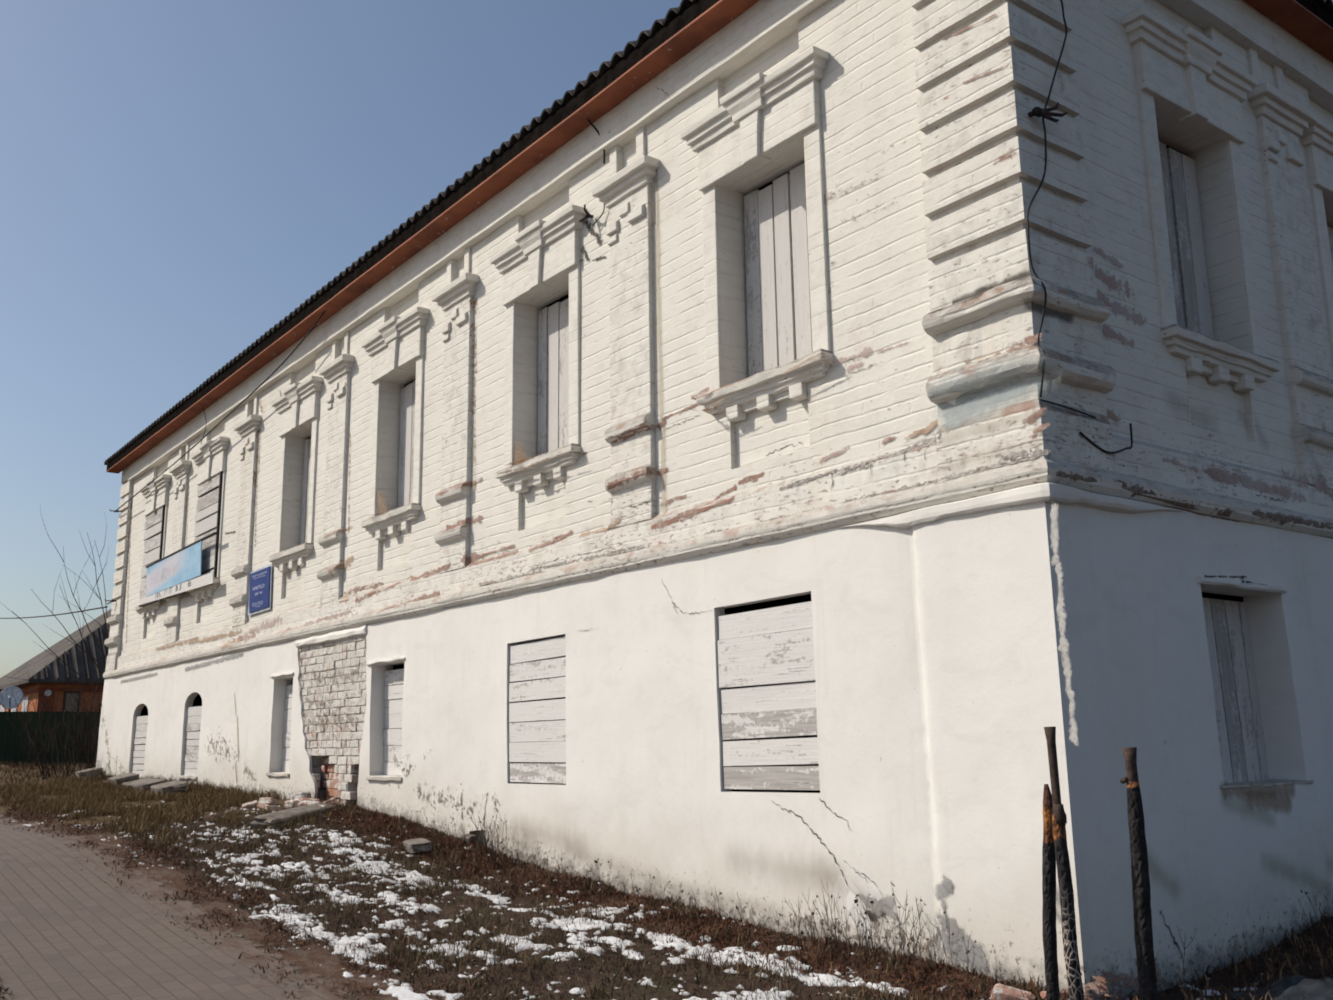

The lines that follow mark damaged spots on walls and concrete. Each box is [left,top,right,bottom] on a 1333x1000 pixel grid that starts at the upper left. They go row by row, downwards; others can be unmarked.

peeling [1089,249,1146,346]
peeling [783,342,907,374]
peeling [965,333,1042,364]
peeling [445,515,483,531]
peeling [478,472,764,586]
peeling [607,466,668,490]
peeling [758,407,1050,524]
spalling [1117,458,1333,529]
peeling [156,518,620,671]
peeling [206,733,256,781]
flaking render [299,635,367,807]
crack [772,798,881,893]